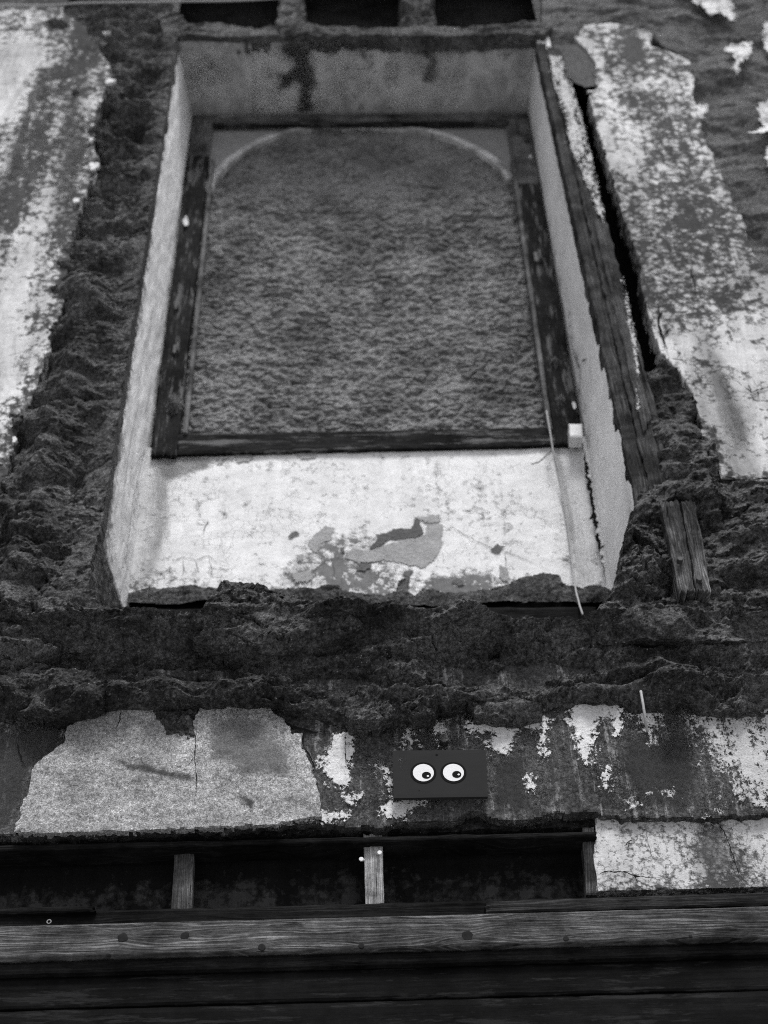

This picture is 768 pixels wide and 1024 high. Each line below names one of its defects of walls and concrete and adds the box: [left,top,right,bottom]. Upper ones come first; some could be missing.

leakage [280,41,315,112]
spalling [0,0,768,648]
spalling [59,732,364,844]
peeling [399,719,450,750]
spalling [369,763,595,837]
peeling [465,704,665,793]
peeling [679,709,768,820]